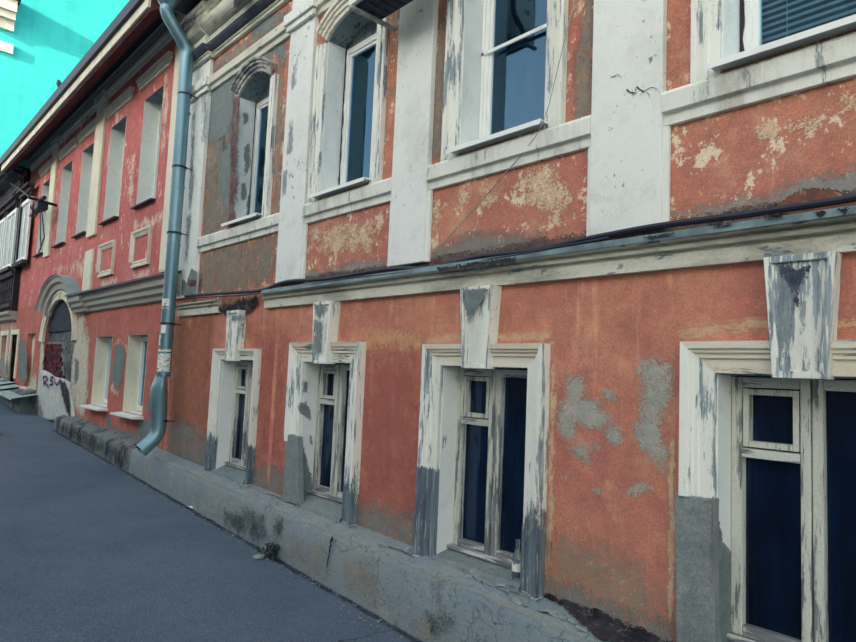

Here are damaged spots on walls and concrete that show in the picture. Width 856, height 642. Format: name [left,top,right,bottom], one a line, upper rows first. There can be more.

flaking render [213,8,290,73]
flaking render [264,41,298,214]
peeling [755,117,826,145]
flaking render [181,75,276,297]
peeling [457,162,574,228]
flaking render [670,163,856,218]
peeling [305,217,387,278]
flaking render [431,228,550,259]
peeling [554,353,677,479]
peeling [413,465,440,557]